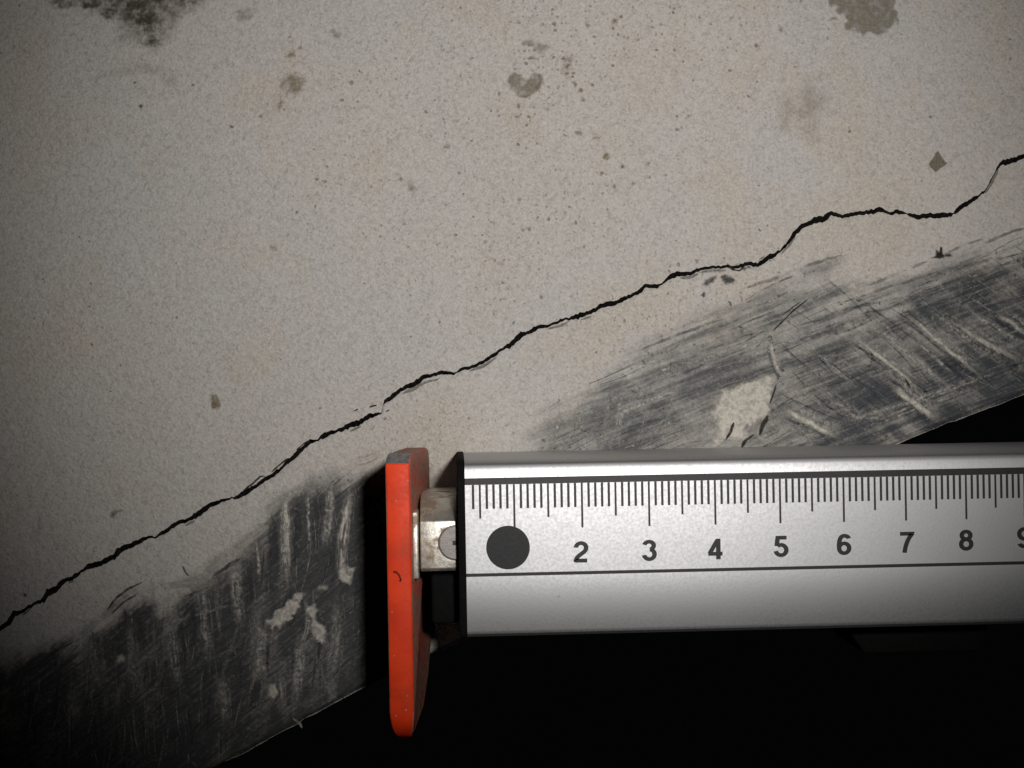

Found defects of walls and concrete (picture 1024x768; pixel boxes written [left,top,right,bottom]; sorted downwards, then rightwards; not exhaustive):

crack [0,154,1024,631]